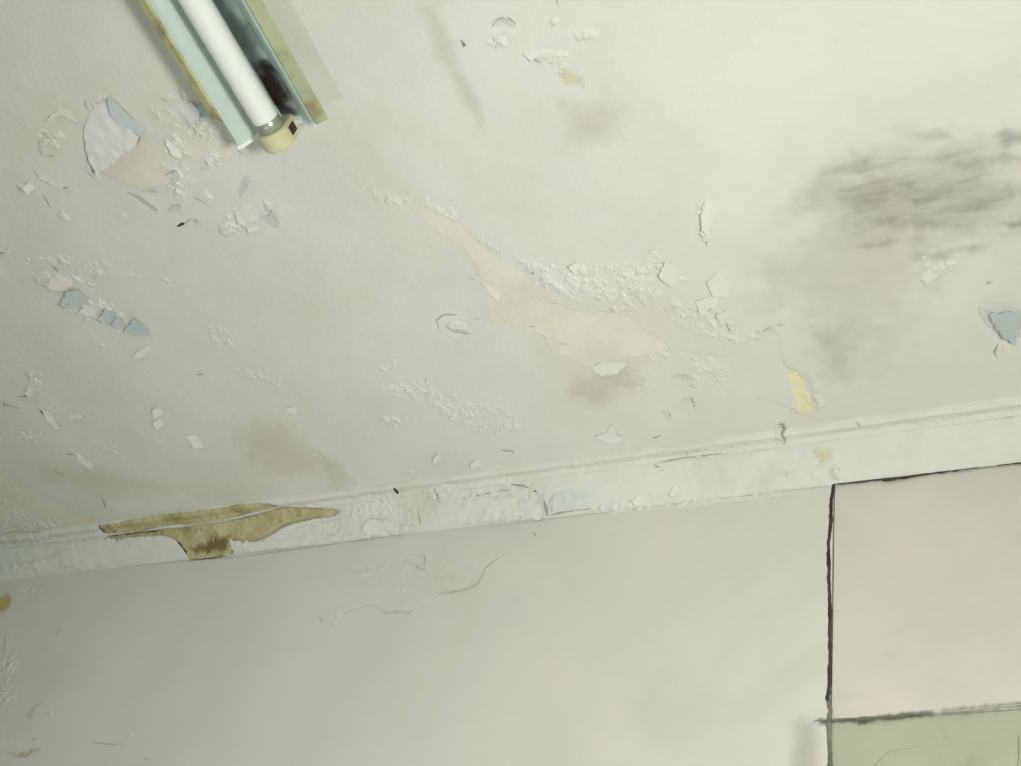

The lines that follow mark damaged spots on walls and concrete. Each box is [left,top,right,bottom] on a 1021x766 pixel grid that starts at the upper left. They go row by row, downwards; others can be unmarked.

peeling [81,81,279,238]
peeling [32,252,151,359]
peeling [591,362,627,378]
peeling [978,307,1021,357]
crack [773,422,787,445]
peeling [99,477,548,561]
crack [721,462,1021,766]